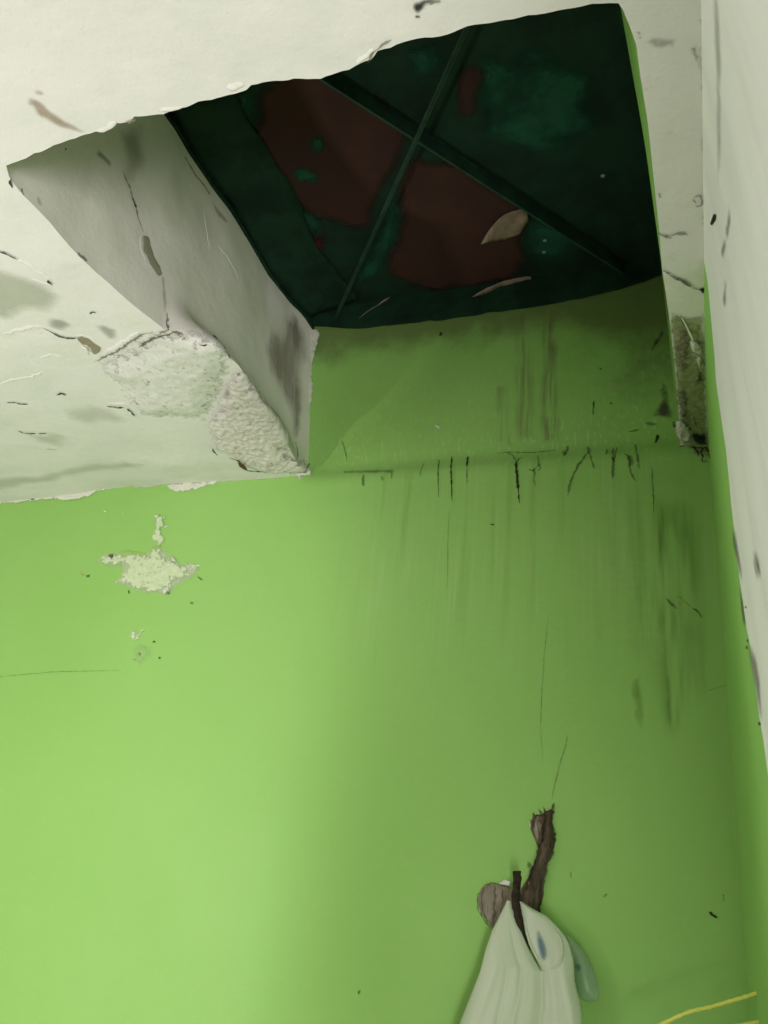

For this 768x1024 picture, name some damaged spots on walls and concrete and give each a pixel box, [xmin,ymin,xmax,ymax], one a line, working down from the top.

spalling [356,40,391,64]
spalling [227,81,244,91]
spalling [95,120,134,133]
peeling [139,233,162,276]
peeling [0,324,103,355]
flaking render [671,316,710,463]
flaking render [208,372,310,474]
damp [508,453,541,503]
damp [606,444,654,510]
peeling [100,514,202,594]
flaking render [477,803,556,929]